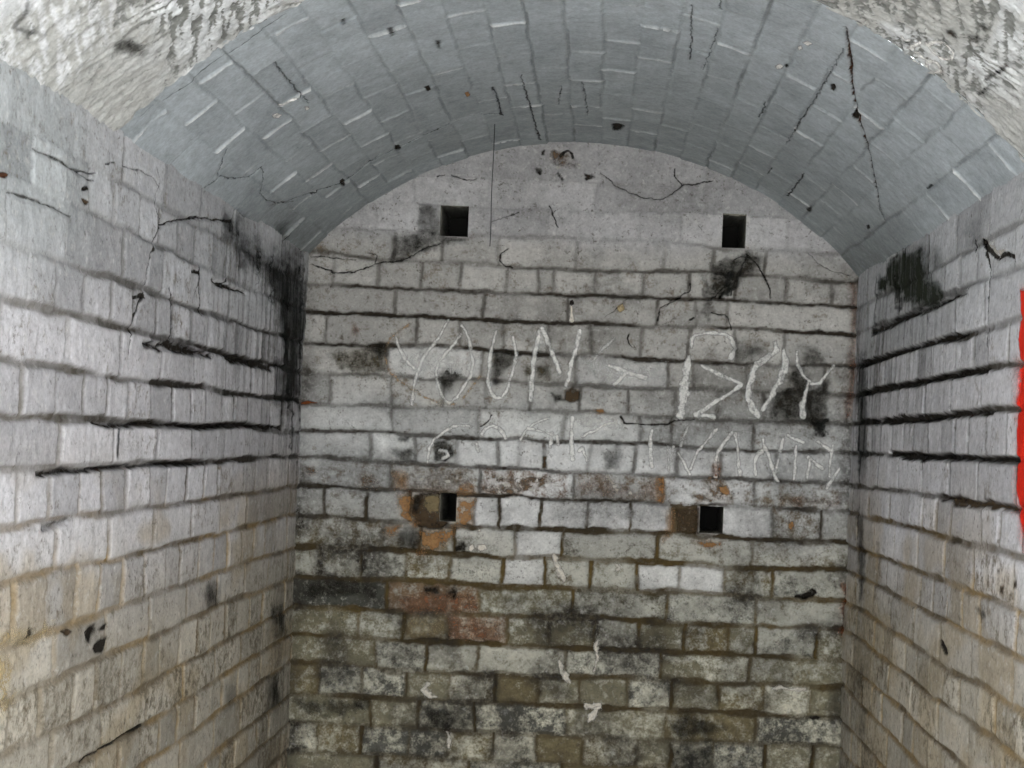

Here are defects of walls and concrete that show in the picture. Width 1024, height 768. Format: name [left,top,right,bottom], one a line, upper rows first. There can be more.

crack [789,28,880,209]
crack [11,193,67,216]
crack [32,148,231,259]
crack [127,270,244,353]
leakage [222,217,304,464]
crack [312,244,439,274]
leakage [874,248,944,333]
crack [975,239,1016,346]
crack [620,416,695,426]
leakage [299,699,369,715]
leakage [427,710,467,729]
leakage [673,716,715,738]